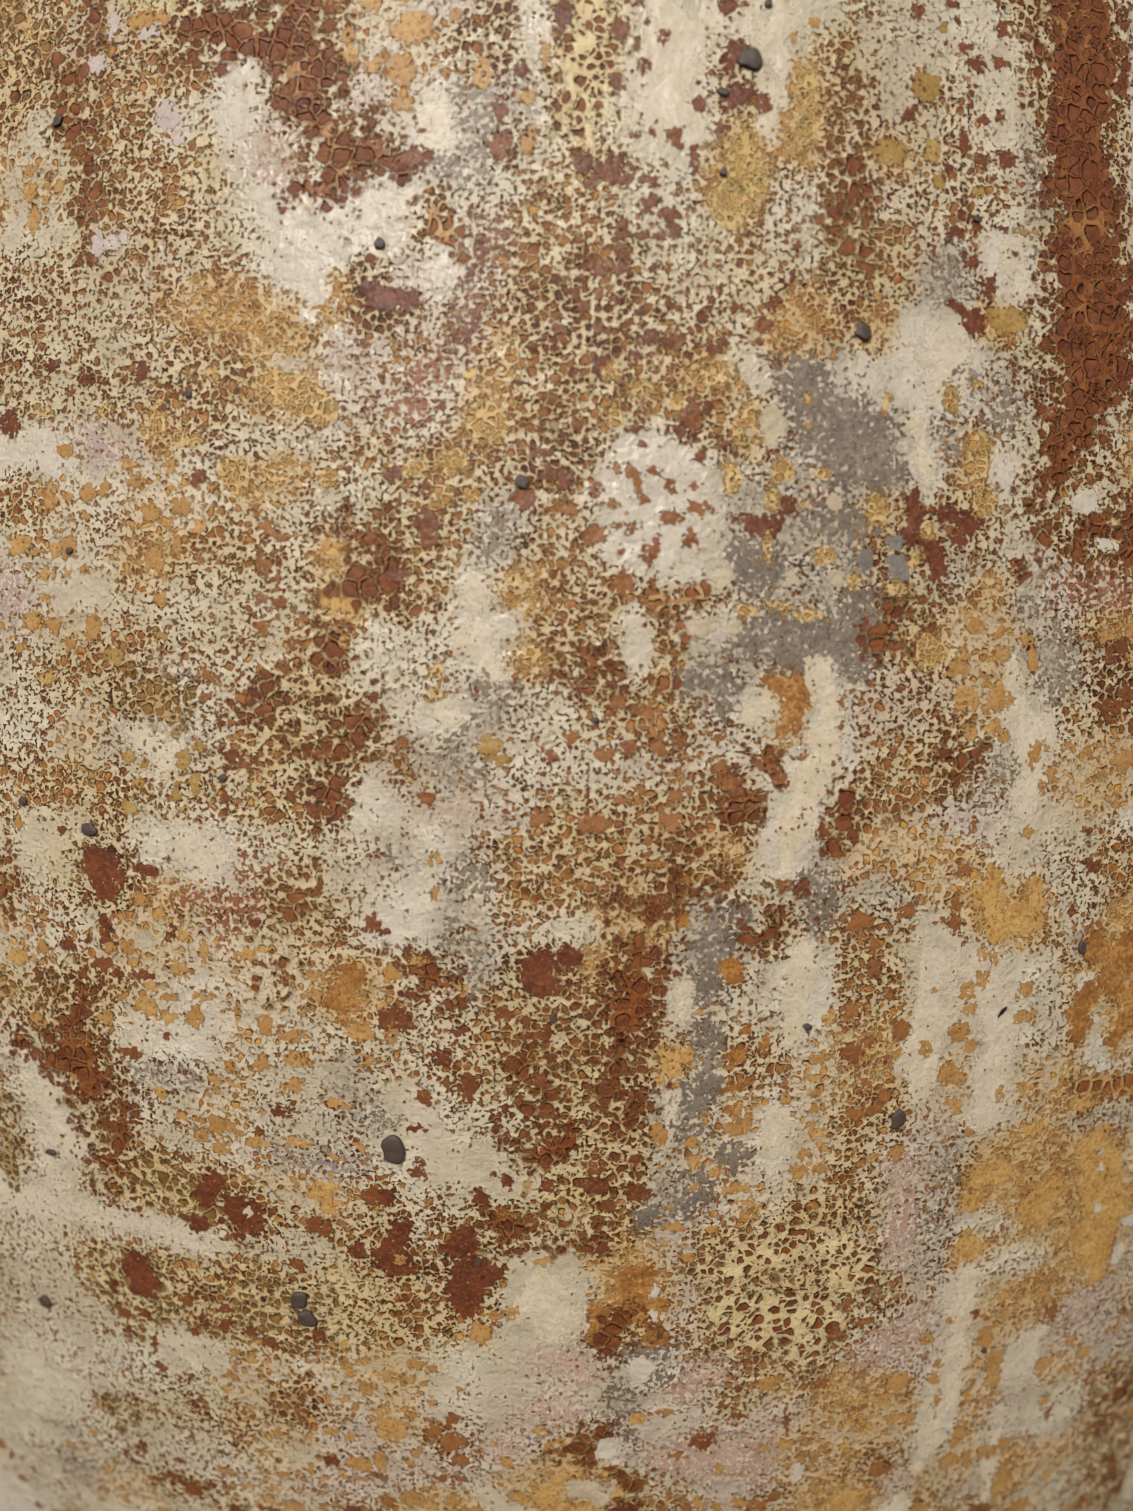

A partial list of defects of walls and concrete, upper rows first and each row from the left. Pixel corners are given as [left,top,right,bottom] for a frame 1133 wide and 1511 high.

peeling [211,37,271,152]
peeling [411,88,457,165]
peeling [1123,11,1133,197]
peeling [1071,488,1100,516]
peeling [1094,537,1122,552]
peeling [0,1050,369,1360]